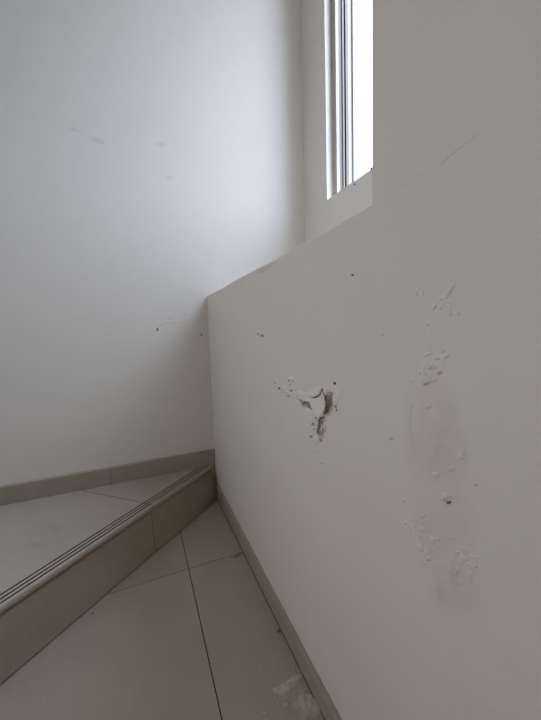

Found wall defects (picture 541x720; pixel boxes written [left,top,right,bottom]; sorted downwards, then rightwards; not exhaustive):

peeling [274,375,340,453]